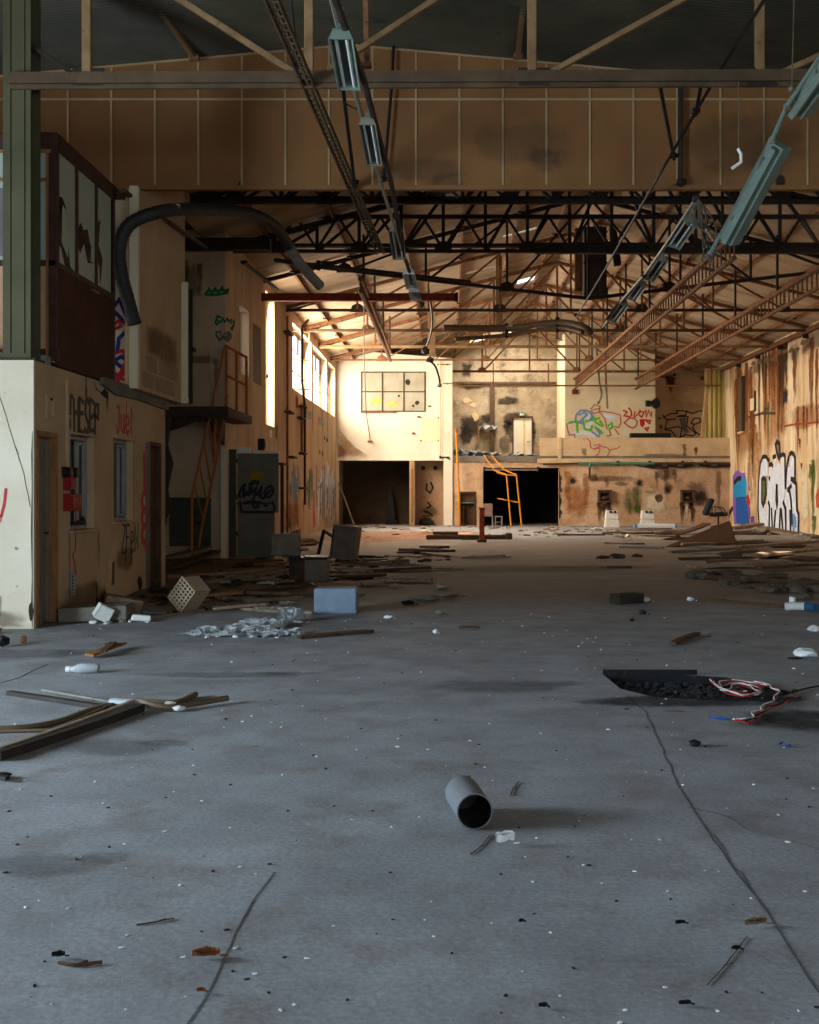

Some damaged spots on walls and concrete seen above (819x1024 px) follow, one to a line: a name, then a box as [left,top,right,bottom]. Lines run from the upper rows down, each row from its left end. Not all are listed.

water stain [460,427,472,443]
water stain [498,397,517,405]
rust [734,337,818,471]
crack [626,696,819,993]